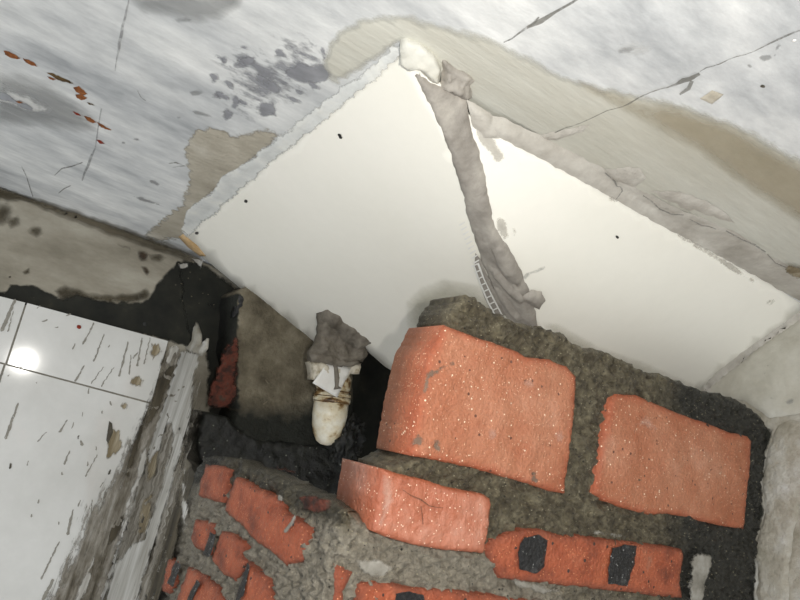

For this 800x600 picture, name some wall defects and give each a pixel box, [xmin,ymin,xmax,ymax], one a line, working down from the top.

corrosion [4,51,38,67]
corrosion [47,73,93,105]
leakage [210,43,330,120]
crack [504,0,576,43]
crack [555,30,799,133]
peeling [700,90,724,104]
leakage [0,188,237,600]
leakage [352,351,391,462]